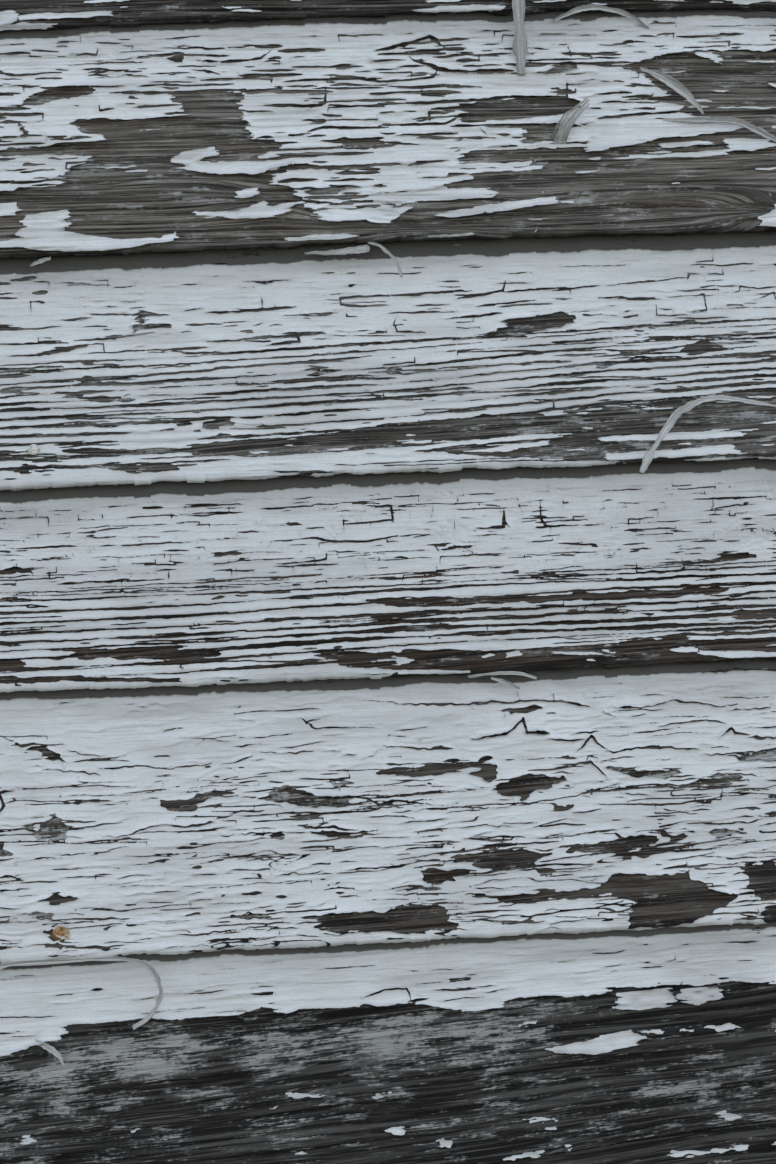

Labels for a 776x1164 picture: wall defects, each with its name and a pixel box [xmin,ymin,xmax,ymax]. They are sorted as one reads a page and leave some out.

peeling [0,50,776,257]
crack [0,277,776,459]
peeling [62,387,776,474]
crack [697,496,766,516]
crack [0,501,776,678]
peeling [314,608,776,678]
crack [0,790,14,812]
crack [46,694,776,875]
crack [180,921,296,936]
peeling [301,904,459,936]
peeling [498,860,776,929]
peeling [0,981,776,1164]